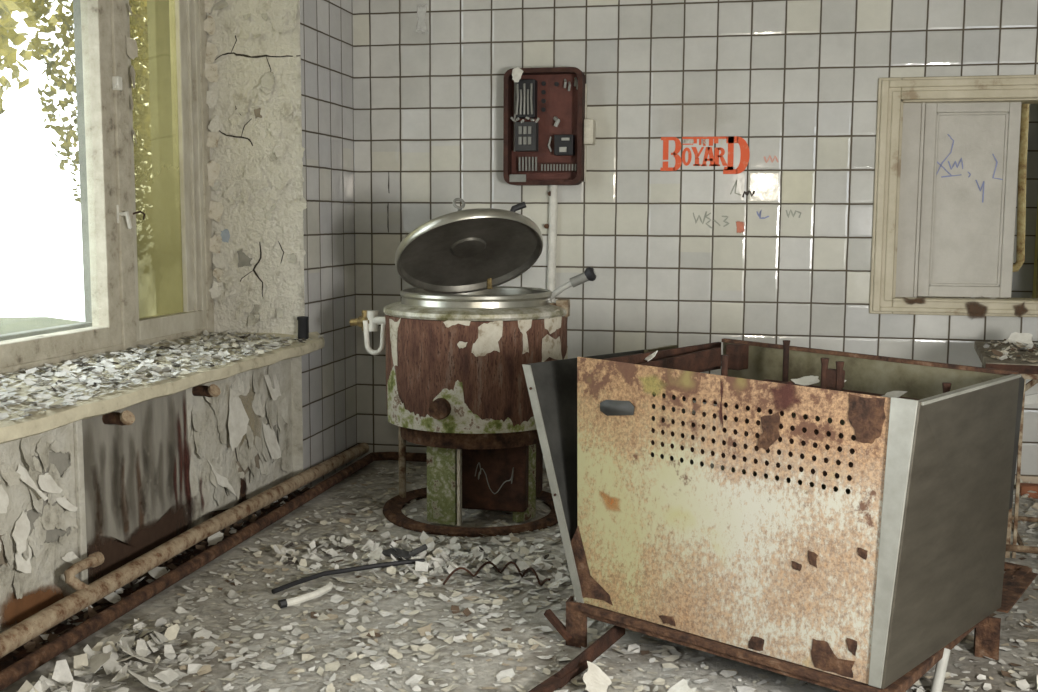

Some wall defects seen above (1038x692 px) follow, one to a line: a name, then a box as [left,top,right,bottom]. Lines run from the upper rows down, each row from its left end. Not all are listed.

crack [215,35,300,72]
crack [219,118,253,146]
crack [240,241,284,297]
peeling [0,364,290,599]
leakage [87,462,249,584]
rust [0,586,68,628]